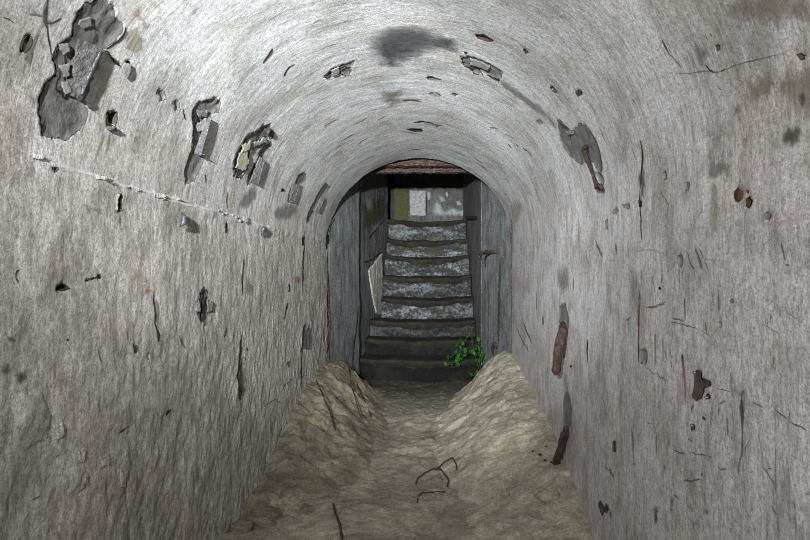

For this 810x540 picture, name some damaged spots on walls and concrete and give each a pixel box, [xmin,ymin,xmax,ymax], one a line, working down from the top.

spalling [38,0,123,140]
spalling [324,61,354,80]
spalling [460,56,502,81]
crack [675,55,777,74]
spalling [157,89,221,184]
spalling [233,125,274,185]
spalling [557,120,604,185]
rust [581,144,604,191]
rust [551,321,567,375]
spalling [691,370,711,412]
rust [531,425,569,465]